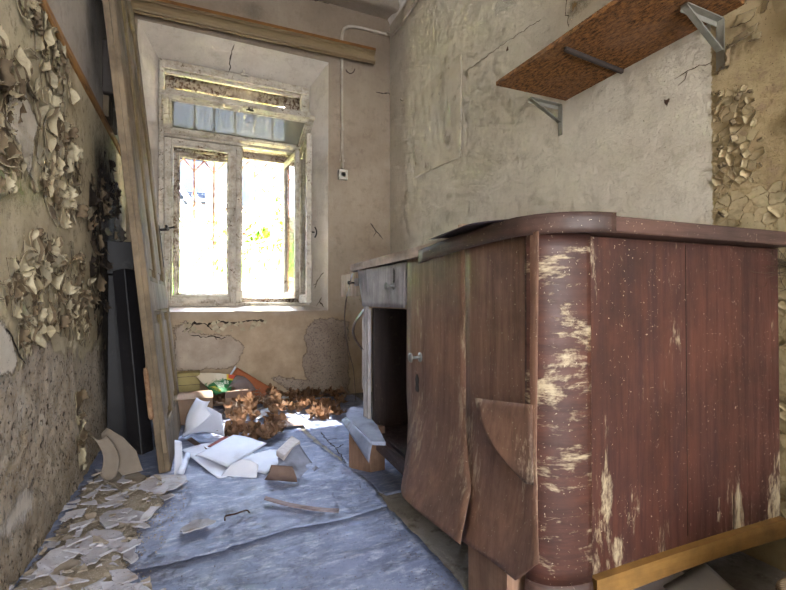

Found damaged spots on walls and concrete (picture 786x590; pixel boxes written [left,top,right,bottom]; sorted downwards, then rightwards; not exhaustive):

peeling [713,0,769,75]
peeling [711,85,786,232]
flaking render [173,319,267,371]
flaking render [272,318,350,397]
peeling [778,253,786,518]